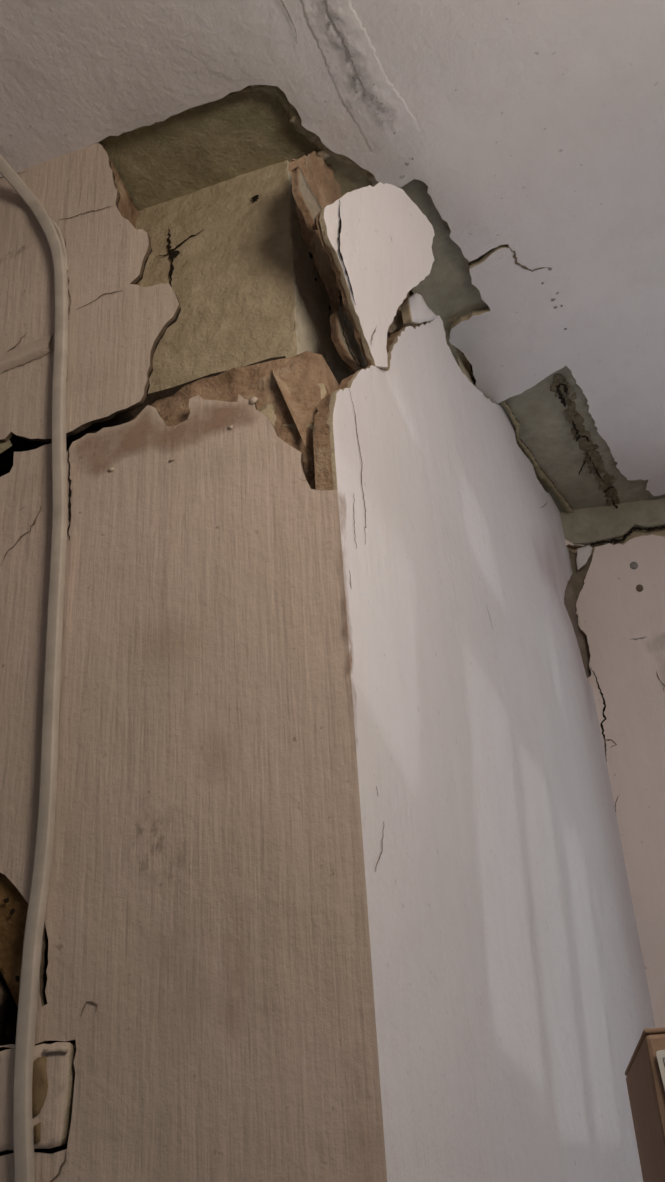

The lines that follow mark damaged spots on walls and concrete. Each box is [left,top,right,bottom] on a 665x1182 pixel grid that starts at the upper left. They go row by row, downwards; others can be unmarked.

spalling [102,143,140,229]
crack [68,278,123,320]
flaking render [288,146,487,398]
crack [0,411,134,564]
spalling [116,351,339,490]
spalling [591,525,665,556]
crack [564,545,617,762]
peeling [32,1056,48,1144]